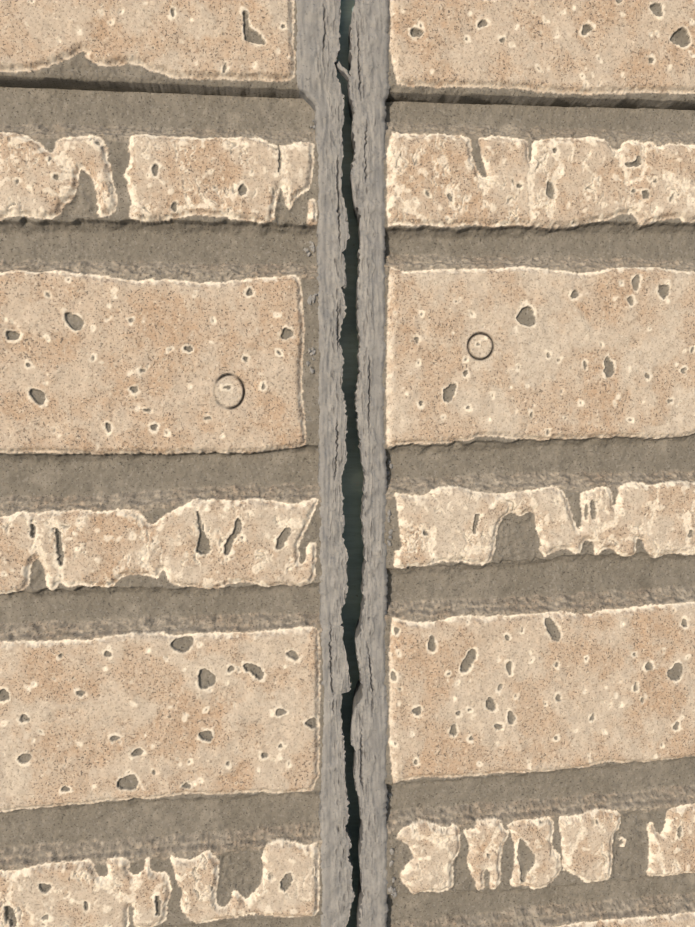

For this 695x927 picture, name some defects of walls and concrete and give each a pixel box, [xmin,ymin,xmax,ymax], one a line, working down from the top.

crack [322,0,374,927]